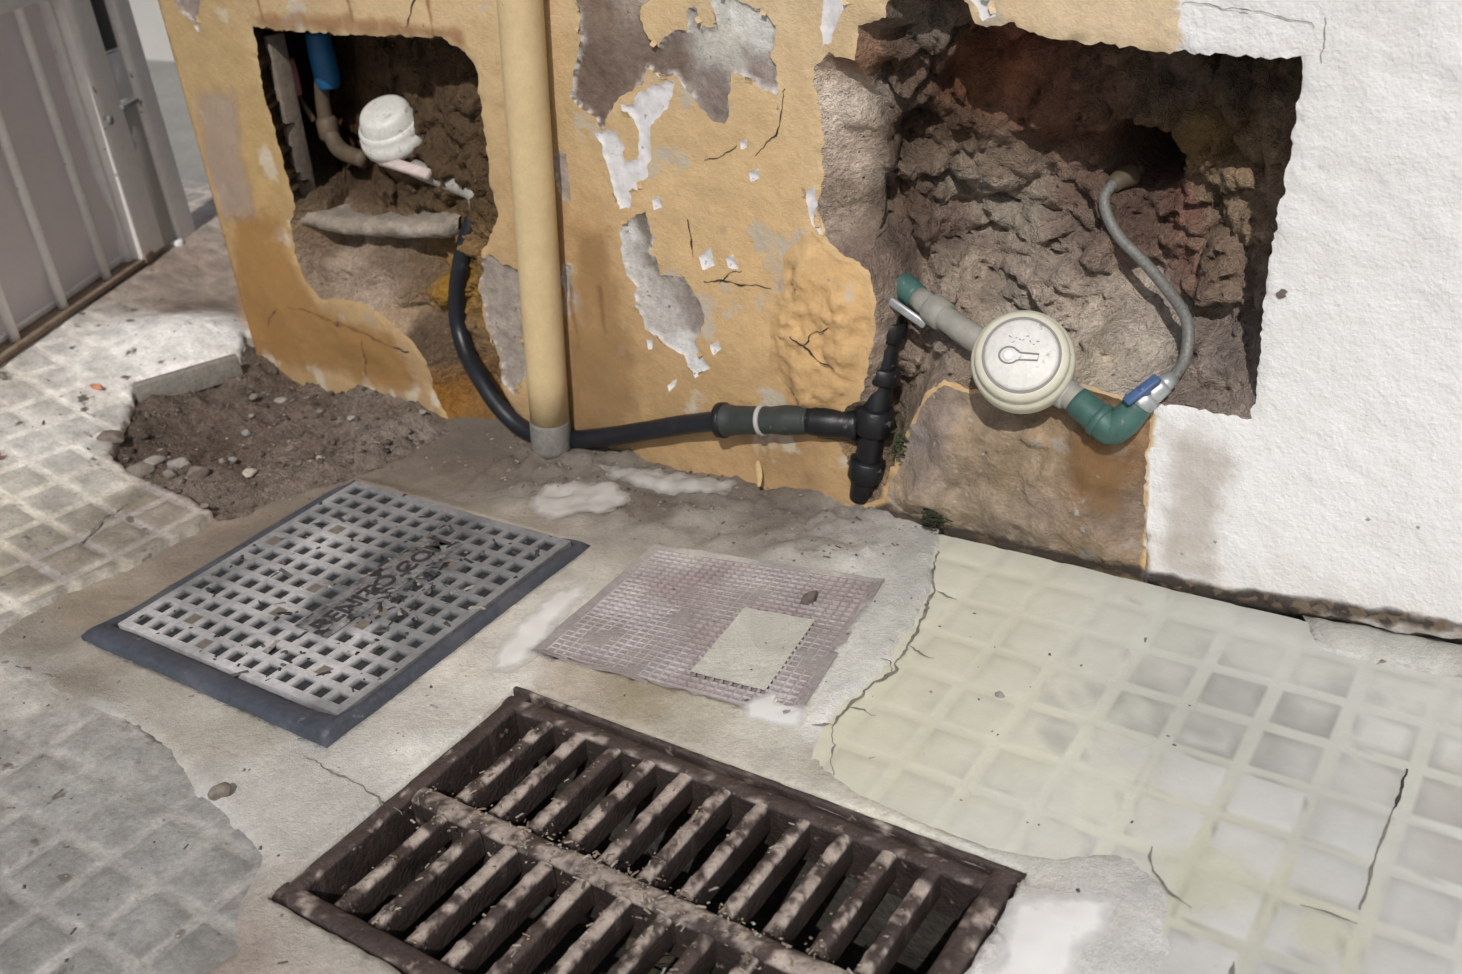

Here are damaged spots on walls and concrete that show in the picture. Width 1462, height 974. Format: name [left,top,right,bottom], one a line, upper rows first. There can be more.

spalling [253,26,526,420]
peeling [569,0,779,392]
spalling [801,0,1303,567]
crack [812,551,955,775]
spalling [397,864,483,942]
spalling [530,921,595,974]
spalling [624,811,692,879]
spalling [664,827,732,897]
spalling [703,842,771,915]
spalling [745,858,815,933]
spalling [834,893,903,972]
crack [1301,768,1408,924]